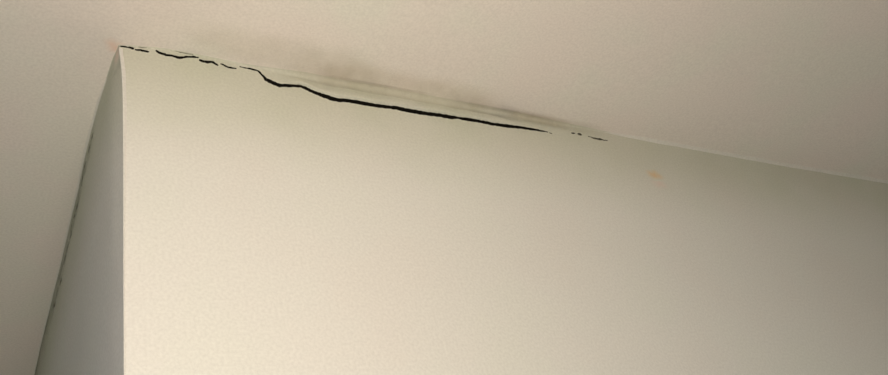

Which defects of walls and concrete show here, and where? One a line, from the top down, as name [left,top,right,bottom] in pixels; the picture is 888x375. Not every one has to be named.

crack [120,46,608,141]